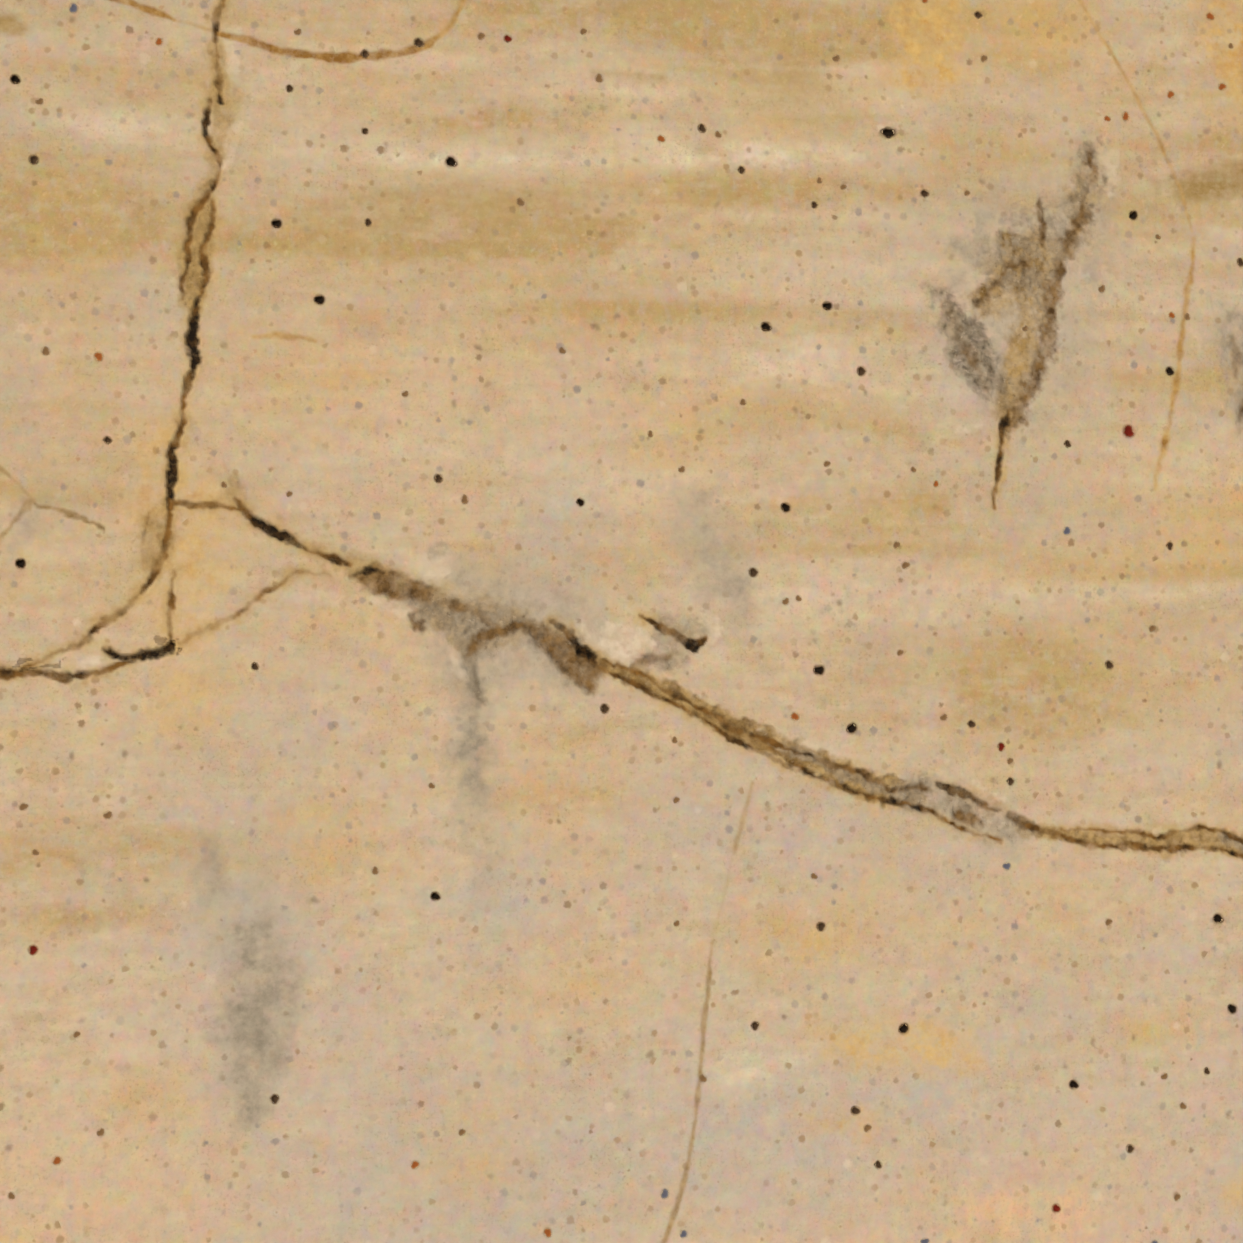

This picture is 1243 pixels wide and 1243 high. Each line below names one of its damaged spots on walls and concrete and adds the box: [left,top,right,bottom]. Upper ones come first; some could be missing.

crack [0,0,470,696]
crack [1075,0,1198,494]
crack [575,655,1243,1243]